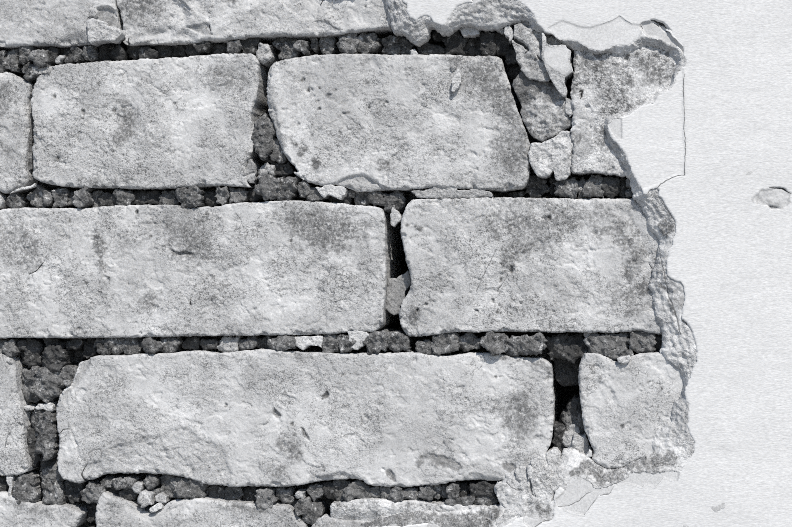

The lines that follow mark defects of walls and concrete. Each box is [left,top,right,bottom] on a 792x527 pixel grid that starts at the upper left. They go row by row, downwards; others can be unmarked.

peeling [548,14,684,53]
peeling [451,69,462,92]
crack [657,74,686,224]
spalling [342,177,384,191]
spalling [752,187,790,209]
peeling [390,207,402,227]
spalling [85,427,232,485]
spalling [416,453,462,471]
peeling [524,471,679,527]
flaking render [312,517,369,527]